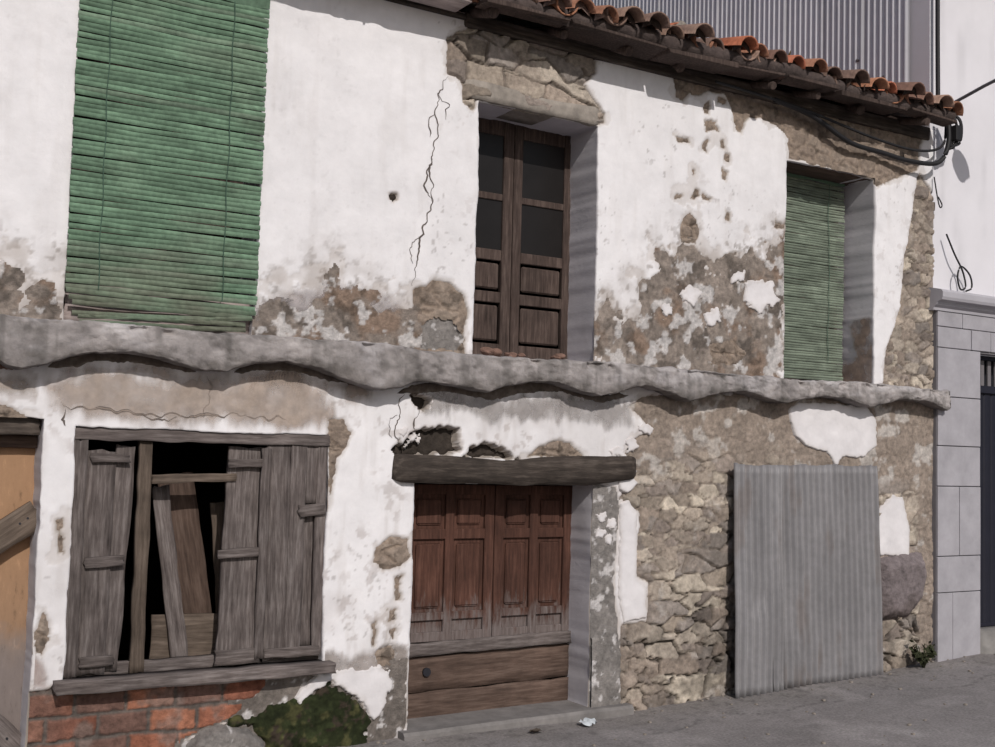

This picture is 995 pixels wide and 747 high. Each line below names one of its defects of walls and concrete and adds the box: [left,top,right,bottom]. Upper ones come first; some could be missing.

spalling [446,28,604,126]
crack [409,80,450,282]
spalling [674,79,935,390]
peeling [0,259,64,320]
peeling [252,263,467,354]
peeling [594,213,785,378]
crack [61,378,282,425]
spalling [391,382,934,711]
spalling [32,613,49,655]
spalling [329,537,410,742]
spalling [27,675,317,747]